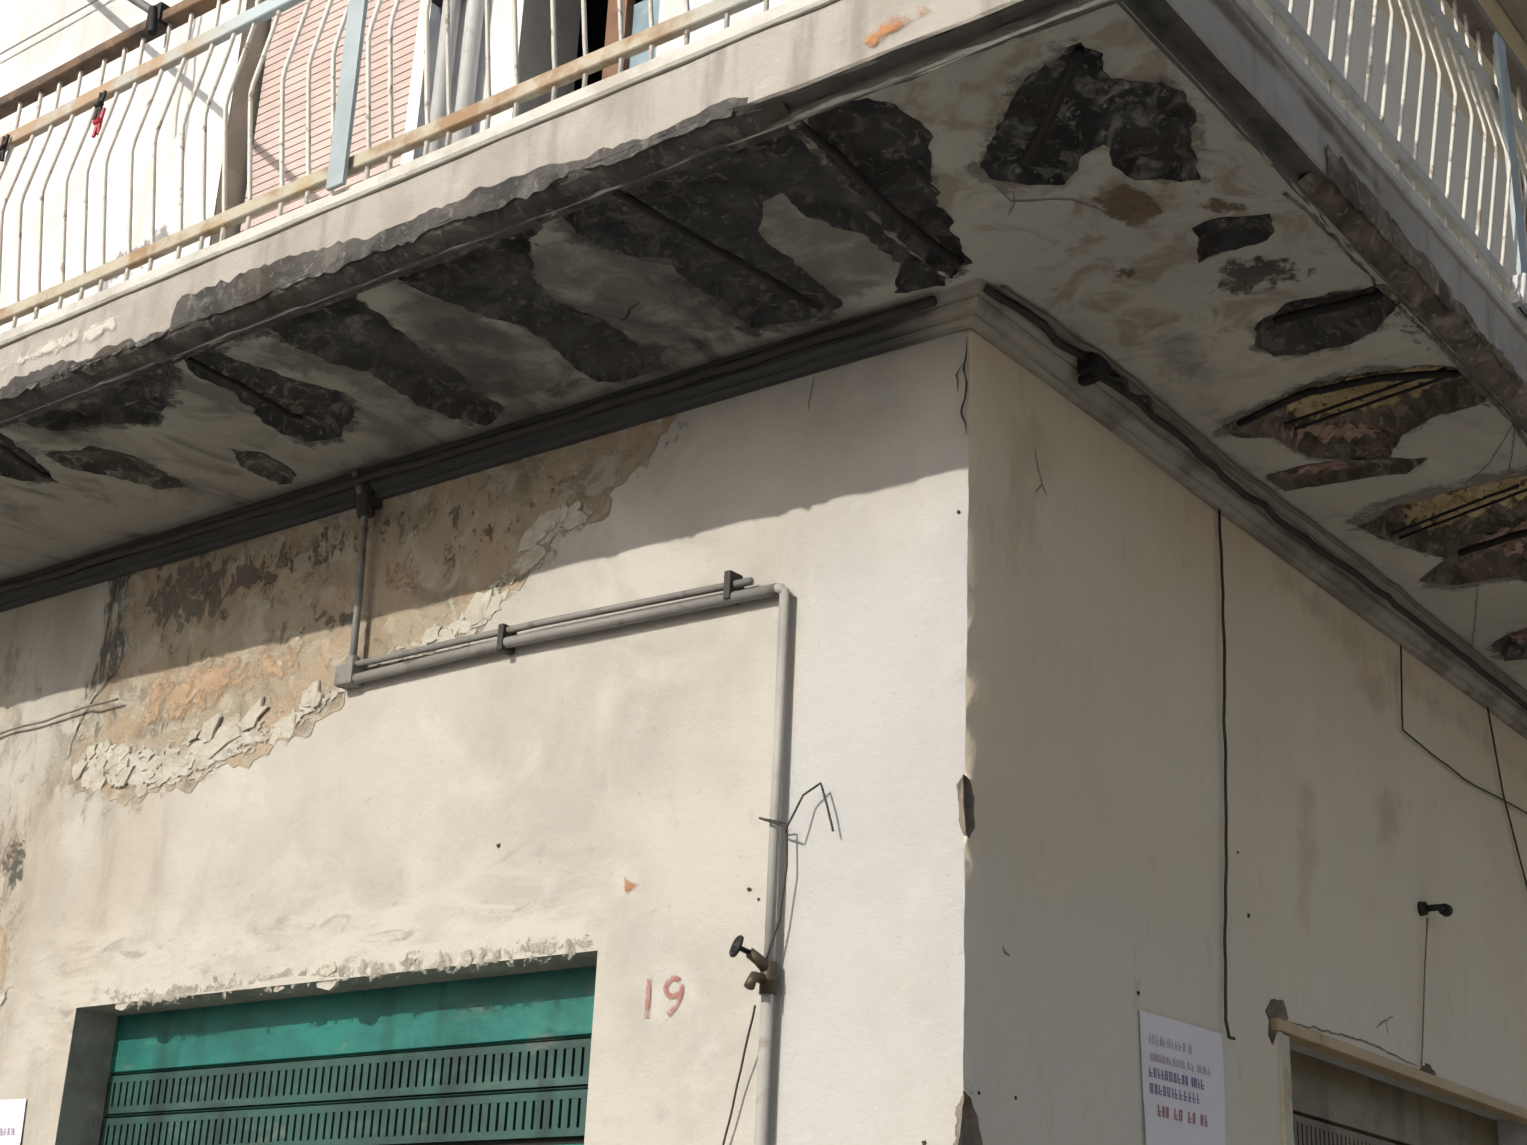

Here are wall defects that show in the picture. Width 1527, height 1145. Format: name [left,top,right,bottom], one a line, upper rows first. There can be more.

spalling [967,39,1211,189]
spalling [0,97,973,490]
spalling [1192,214,1274,263]
spalling [1215,143,1527,492]
spalling [1346,466,1527,590]
flaking render [45,413,680,814]
spalling [1486,628,1527,661]
mould [2,841,25,890]
flaking render [956,774,975,838]
flaking render [953,1080,983,1145]